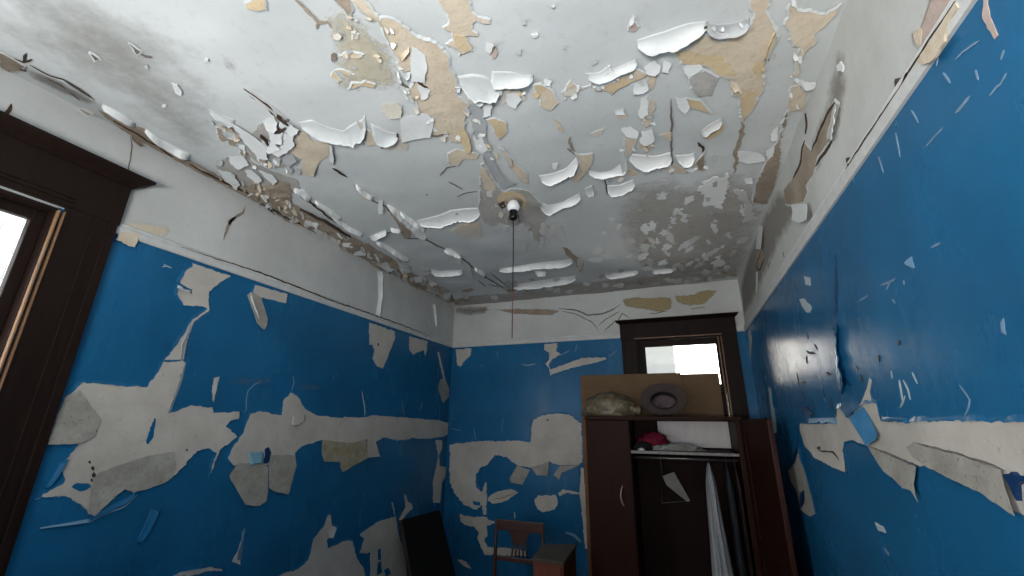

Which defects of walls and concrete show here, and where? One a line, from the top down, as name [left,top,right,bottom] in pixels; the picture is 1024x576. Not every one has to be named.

damp [39,76,85,100]
peeling [911,0,959,65]
peeling [73,0,842,327]
crack [163,207,429,336]